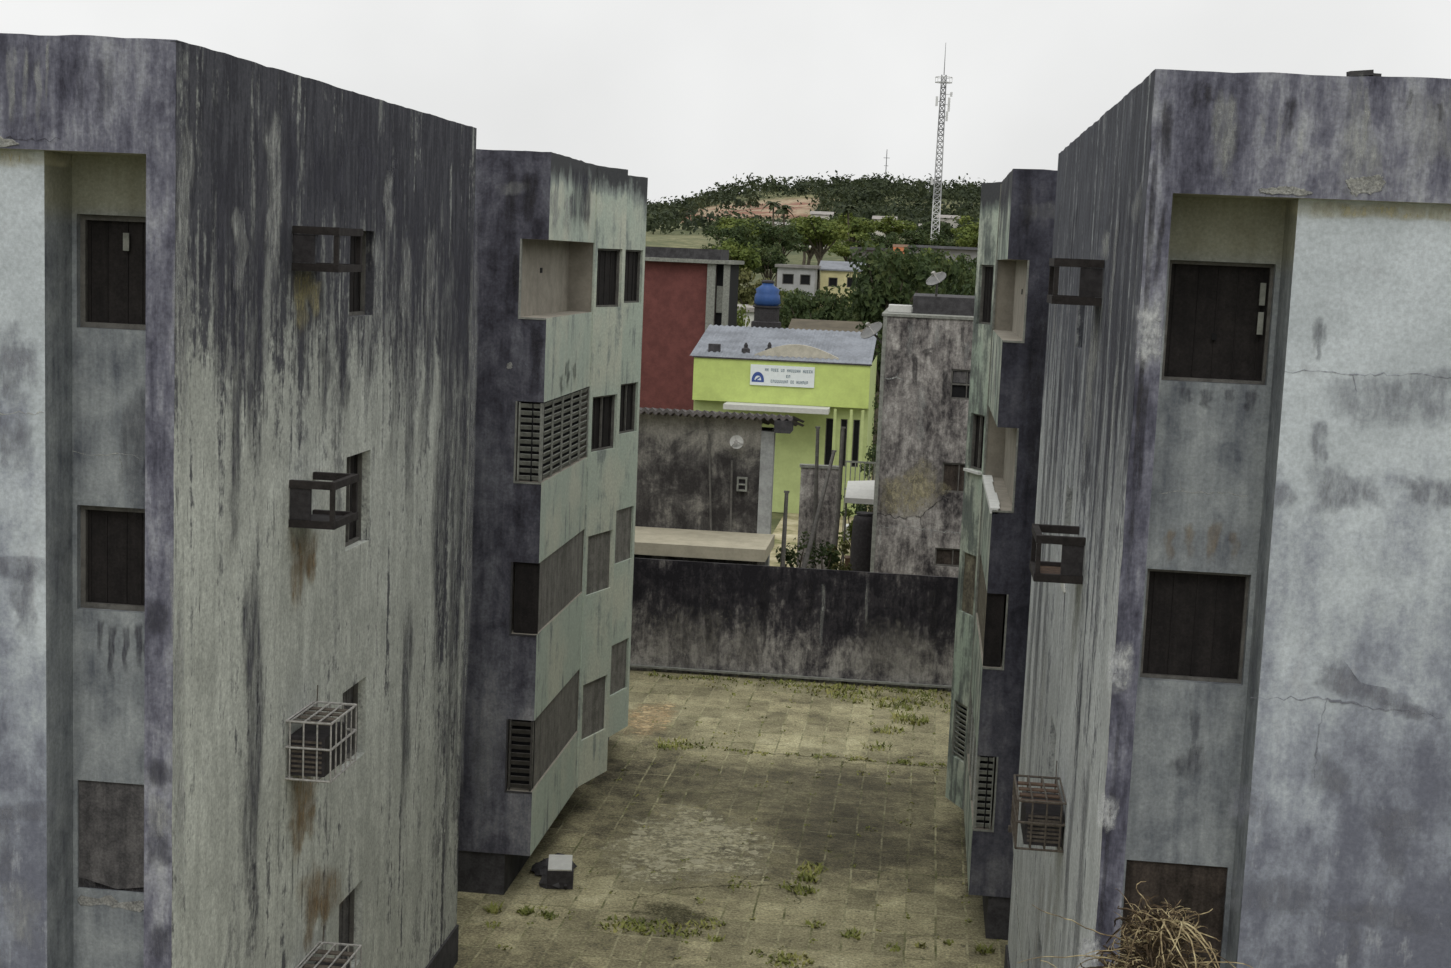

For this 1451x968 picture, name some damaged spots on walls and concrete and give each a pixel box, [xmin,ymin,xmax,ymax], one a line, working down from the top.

spalling [0,136,19,147]
water stain [176,144,192,374]
water stain [215,127,474,675]
water stain [1040,264,1148,559]
water stain [98,596,184,870]
water stain [243,602,262,877]
water stain [403,635,412,762]
crack [1280,696,1439,719]